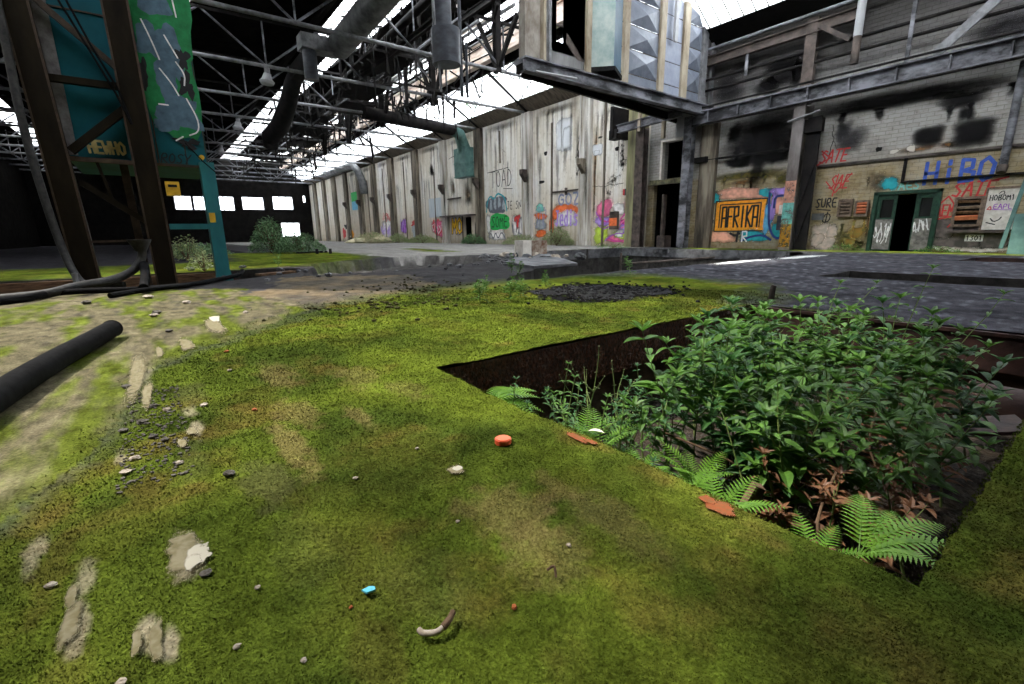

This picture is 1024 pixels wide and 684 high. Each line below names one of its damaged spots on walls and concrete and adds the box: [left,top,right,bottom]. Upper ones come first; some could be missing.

damp [734,126,772,188]